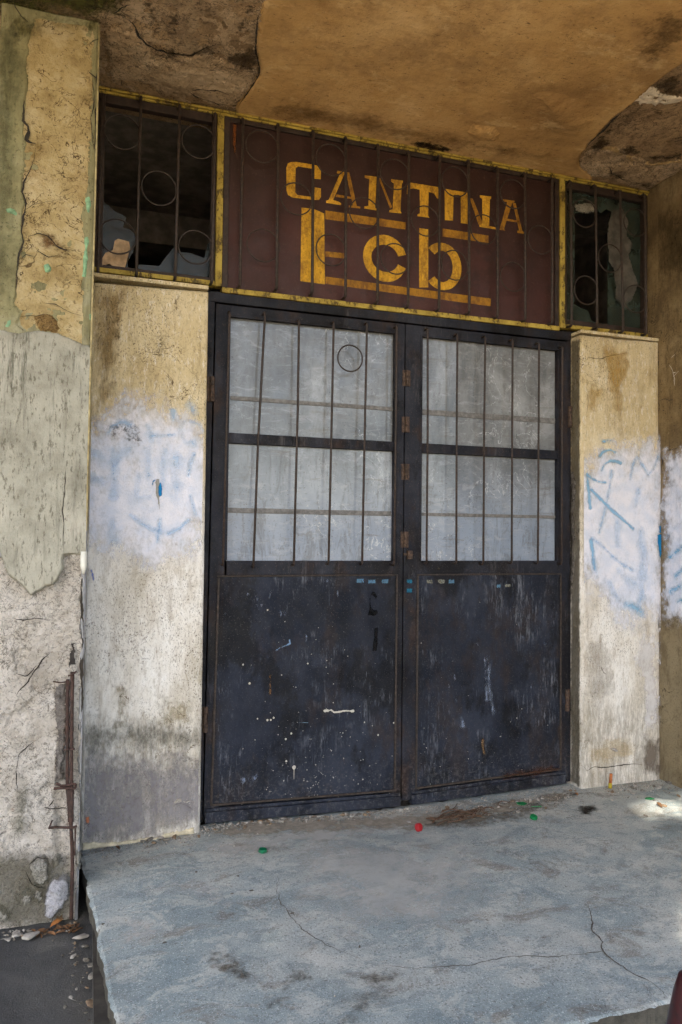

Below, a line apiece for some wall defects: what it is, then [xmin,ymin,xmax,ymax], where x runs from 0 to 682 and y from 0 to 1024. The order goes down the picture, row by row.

crack [114,5,214,56]
crack [189,4,264,105]
peeling [5,0,266,344]
spalling [579,64,682,191]
damp [605,351,628,407]
crack [15,652,51,694]
spalling [0,554,194,936]
damp [84,760,199,840]
crack [276,876,664,994]